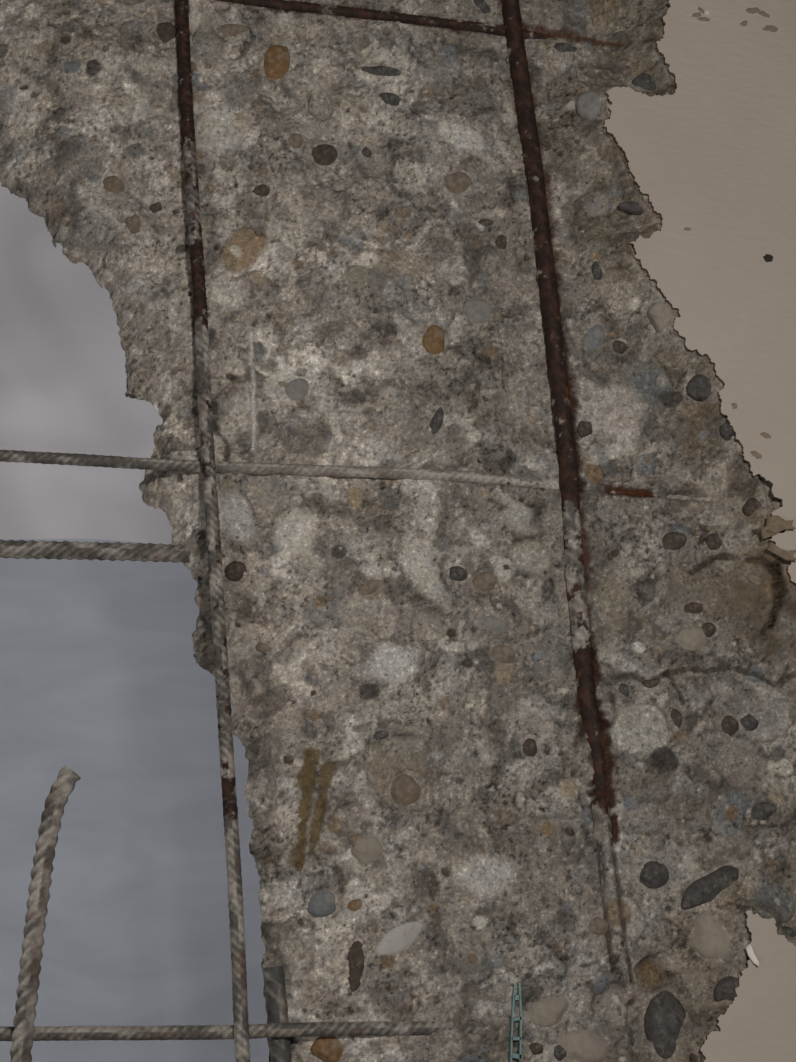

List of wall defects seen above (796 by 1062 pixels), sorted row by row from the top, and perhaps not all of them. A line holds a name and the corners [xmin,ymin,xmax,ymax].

rust [522,23,622,47]
spalling [0,0,215,677]
spalling [188,0,796,1062]
rust [553,253,589,592]
rust [606,486,653,497]
rust [588,605,619,843]